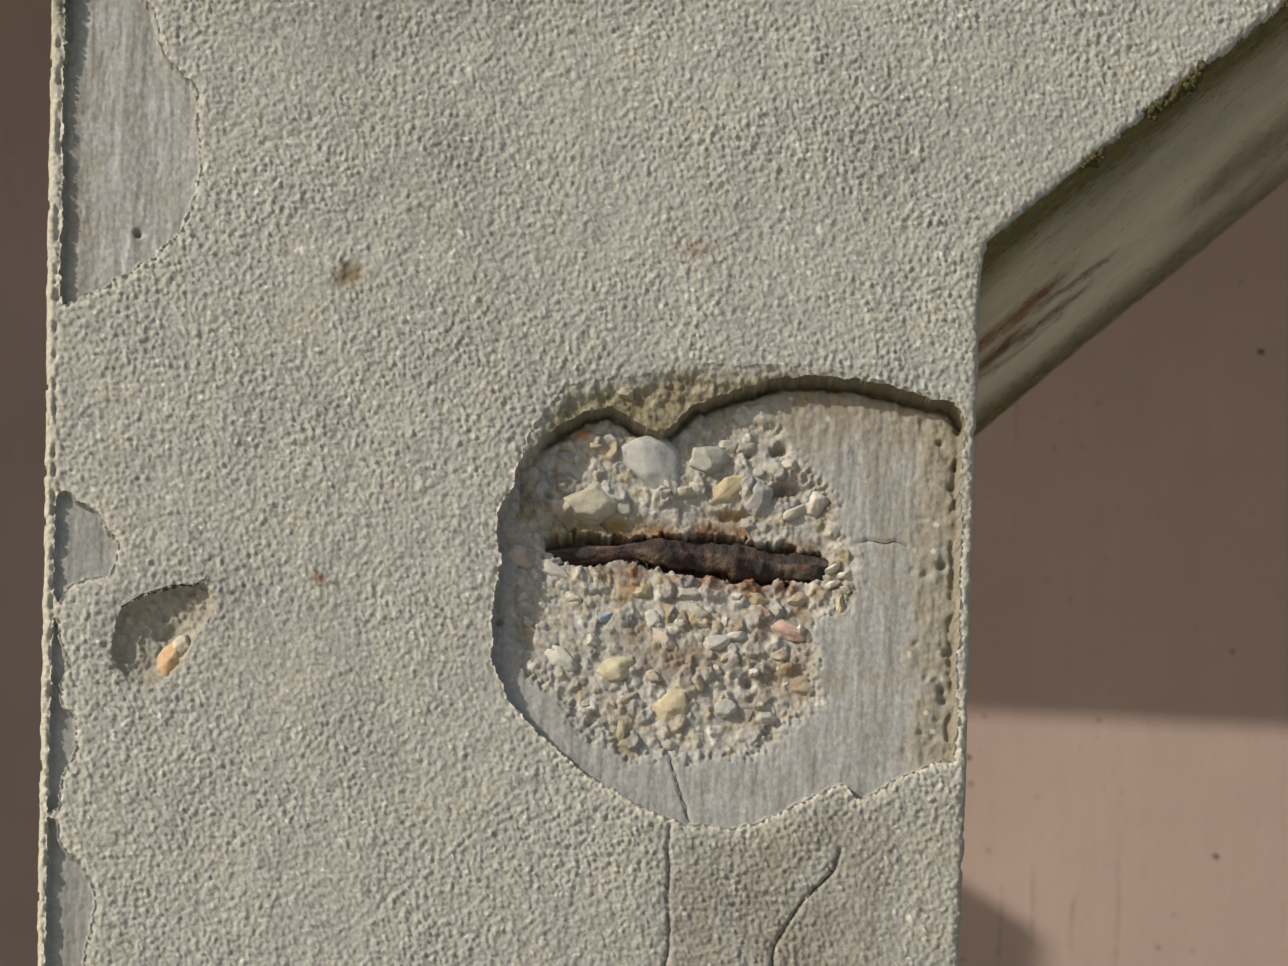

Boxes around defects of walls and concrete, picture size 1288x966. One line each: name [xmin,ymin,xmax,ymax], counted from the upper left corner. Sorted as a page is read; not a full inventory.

flaking render [58,0,201,306]
rust [978,280,1059,371]
flaking render [44,490,118,966]
spalling [109,582,215,689]
spalling [490,362,966,828]
crack [771,851,842,966]